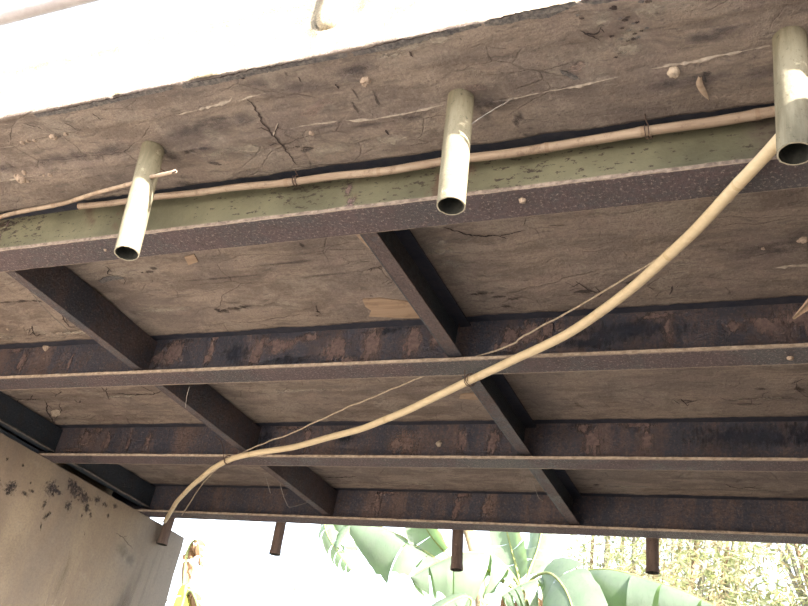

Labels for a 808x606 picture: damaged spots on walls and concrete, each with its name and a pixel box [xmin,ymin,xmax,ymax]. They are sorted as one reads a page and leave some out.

crack [249,101,297,165]
crack [444,227,525,239]
corrosion [248,333,320,365]
corrosion [322,328,382,362]
corrosion [398,327,439,359]
corrosion [493,318,559,353]
corrosion [721,304,808,338]
damp [40,478,117,531]